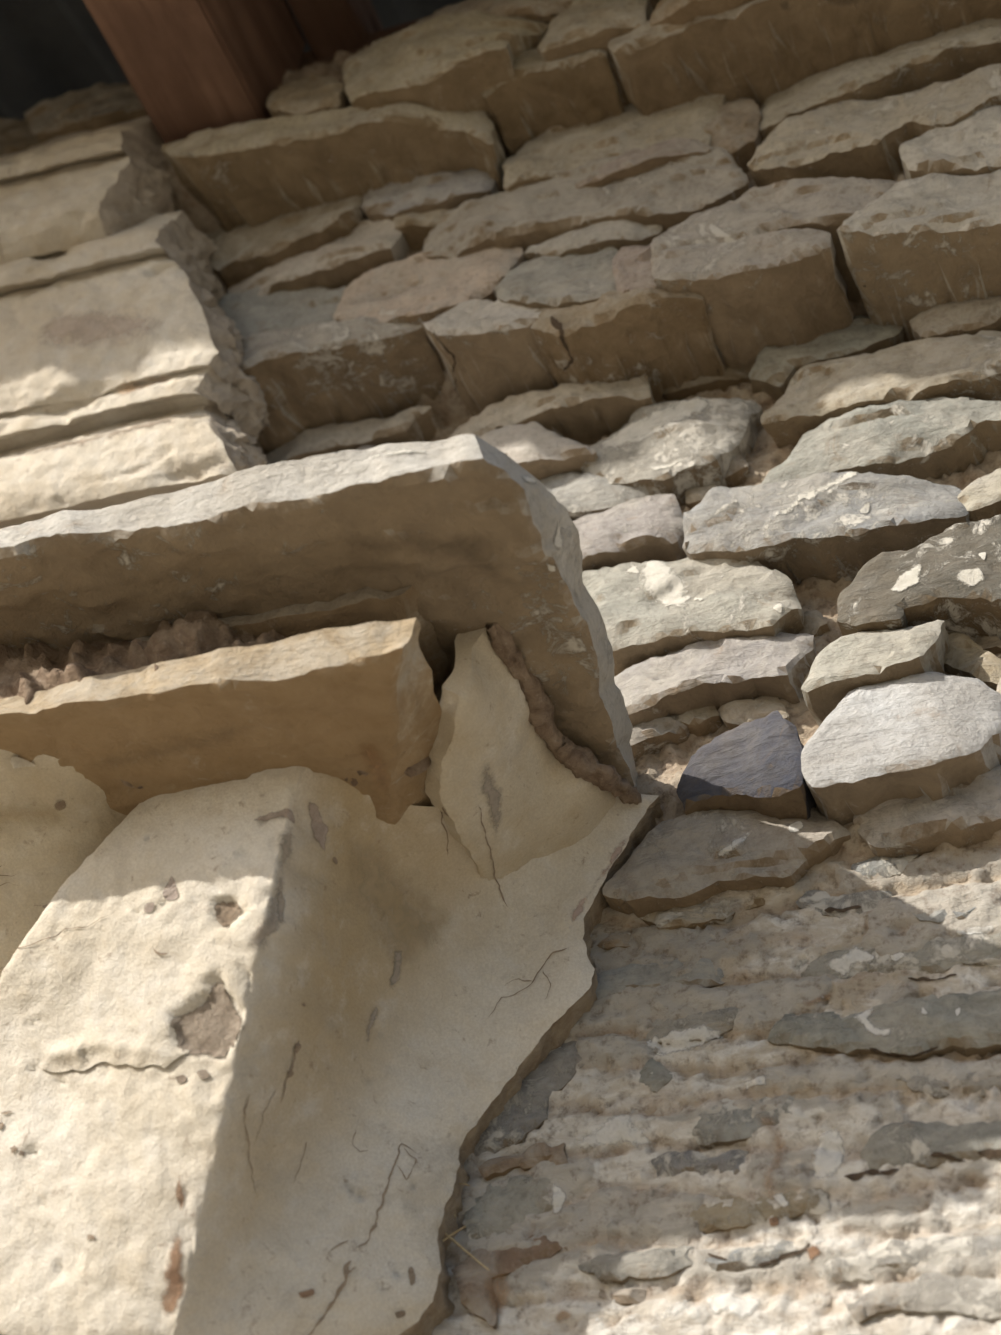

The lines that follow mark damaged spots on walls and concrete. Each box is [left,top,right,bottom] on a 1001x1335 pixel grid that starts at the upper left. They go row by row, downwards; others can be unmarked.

crack [441,807,508,907]
crack [489,948,567,1016]
flaking render [170,983,245,1083]
crack [309,1130,417,1335]